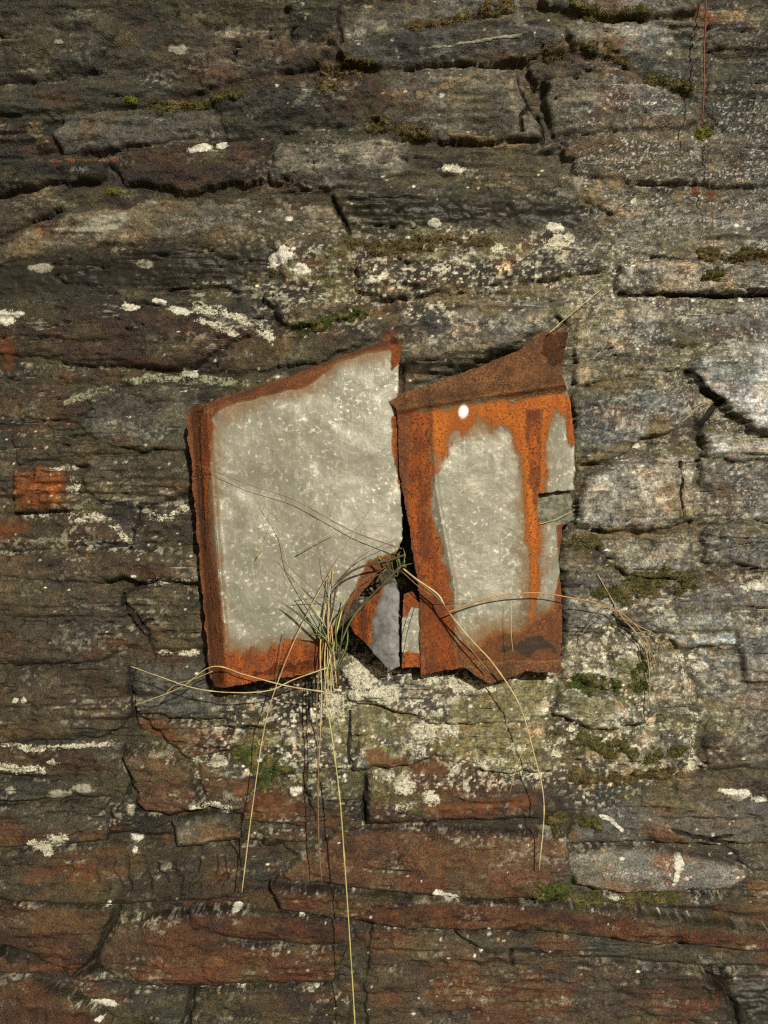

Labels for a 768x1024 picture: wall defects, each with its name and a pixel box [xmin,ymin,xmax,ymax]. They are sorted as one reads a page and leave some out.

corrosion [388,331,575,684]